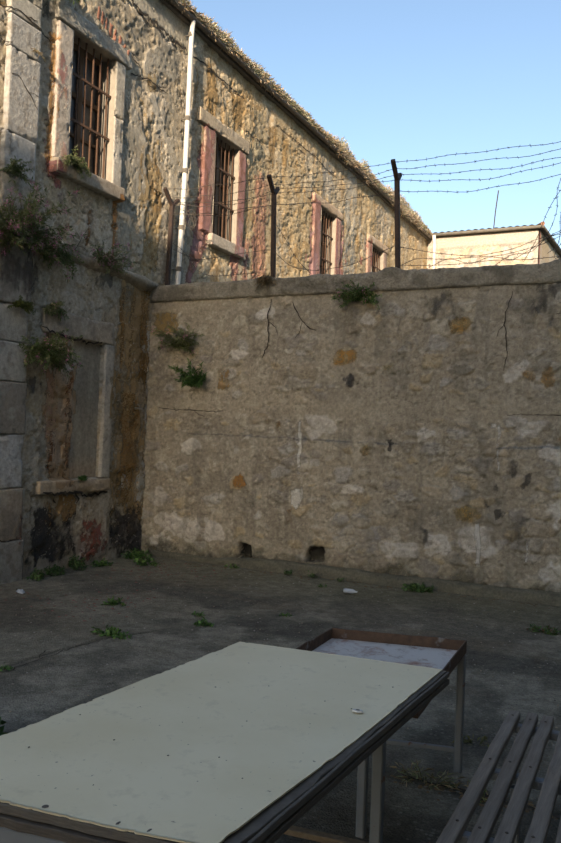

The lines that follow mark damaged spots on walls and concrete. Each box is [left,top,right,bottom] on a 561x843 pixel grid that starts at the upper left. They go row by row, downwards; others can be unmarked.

crack [497,291,513,371]